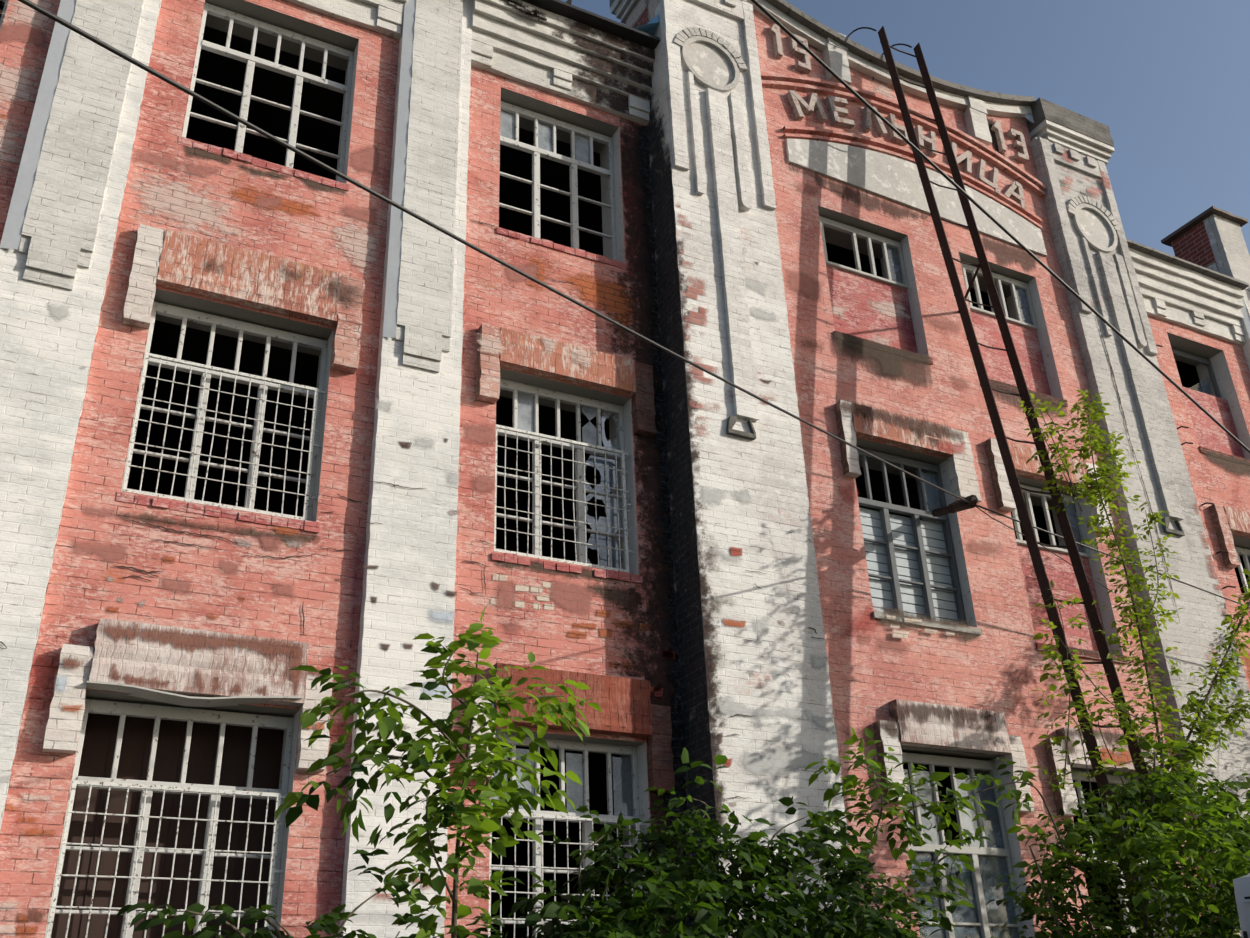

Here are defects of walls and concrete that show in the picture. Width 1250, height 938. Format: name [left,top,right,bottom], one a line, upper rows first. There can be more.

peeling [680,251,707,339]
leakage [479,334,504,354]
peeling [690,356,717,384]
leakage [839,401,963,453]
leakage [496,18,726,938]
spalling [710,601,746,627]
leakage [878,703,996,736]